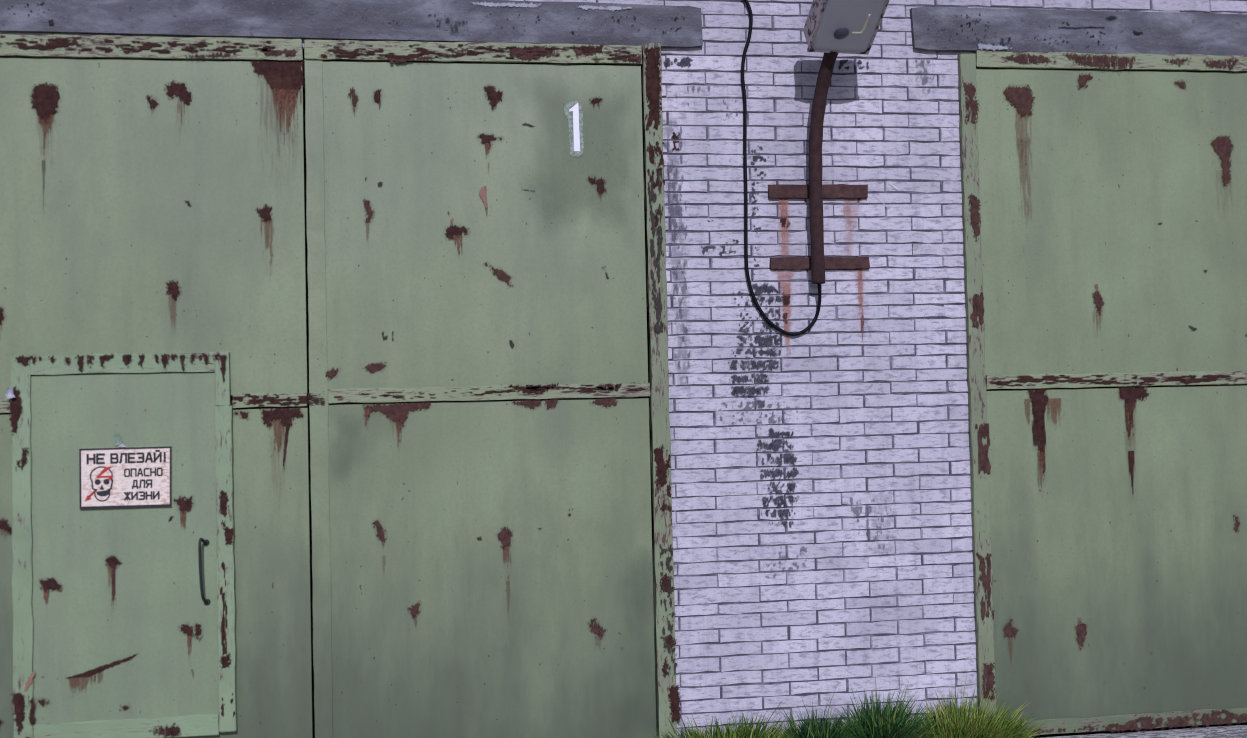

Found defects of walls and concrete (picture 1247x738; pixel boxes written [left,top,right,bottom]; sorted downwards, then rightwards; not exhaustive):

rust [30,82,60,148]
rust [250,60,304,131]
rust [644,47,662,130]
rust [1003,85,1035,117]
rust [1211,136,1233,186]
rust [16,353,227,382]
rust [235,407,303,467]
rust [363,401,431,442]
rust [1025,388,1061,474]
rust [1119,386,1149,494]
rust [654,444,671,512]
rust [660,544,682,722]